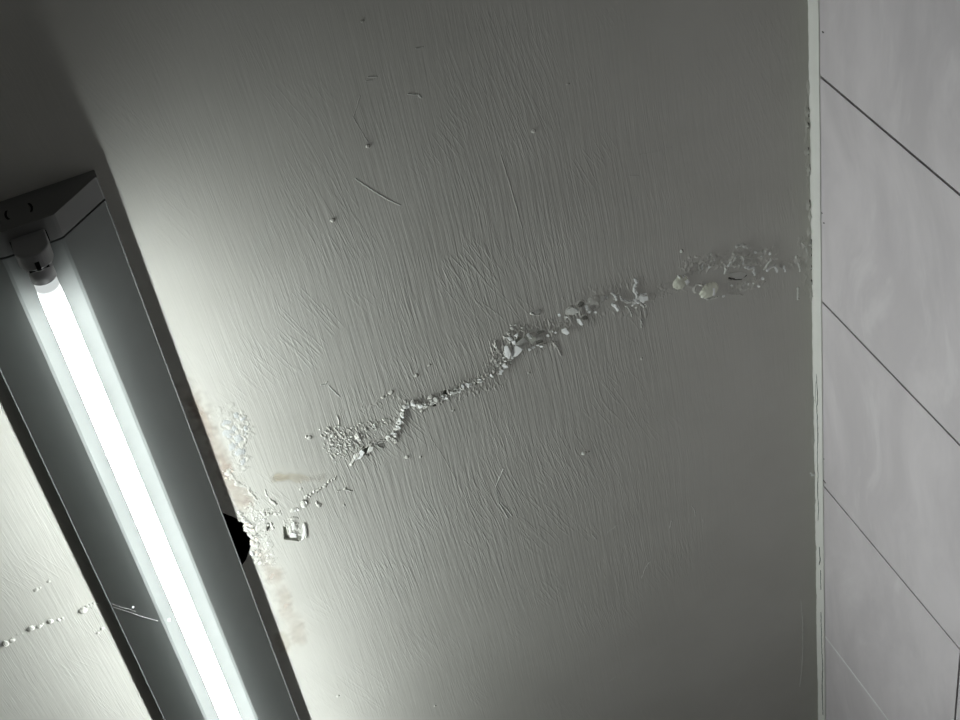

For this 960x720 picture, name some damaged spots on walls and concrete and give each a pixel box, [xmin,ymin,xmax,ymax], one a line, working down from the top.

water stain [207,402,256,473]
peeling [319,392,402,466]
crack [375,358,511,444]
spalling [237,501,308,568]